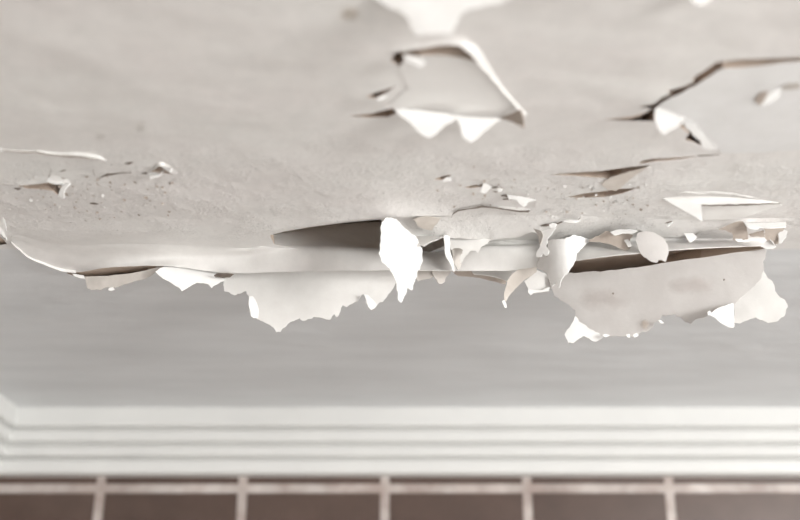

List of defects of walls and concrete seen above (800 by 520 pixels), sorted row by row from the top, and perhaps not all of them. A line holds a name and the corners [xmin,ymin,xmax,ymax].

peeling [0,58,800,343]
peeling [345,0,527,143]